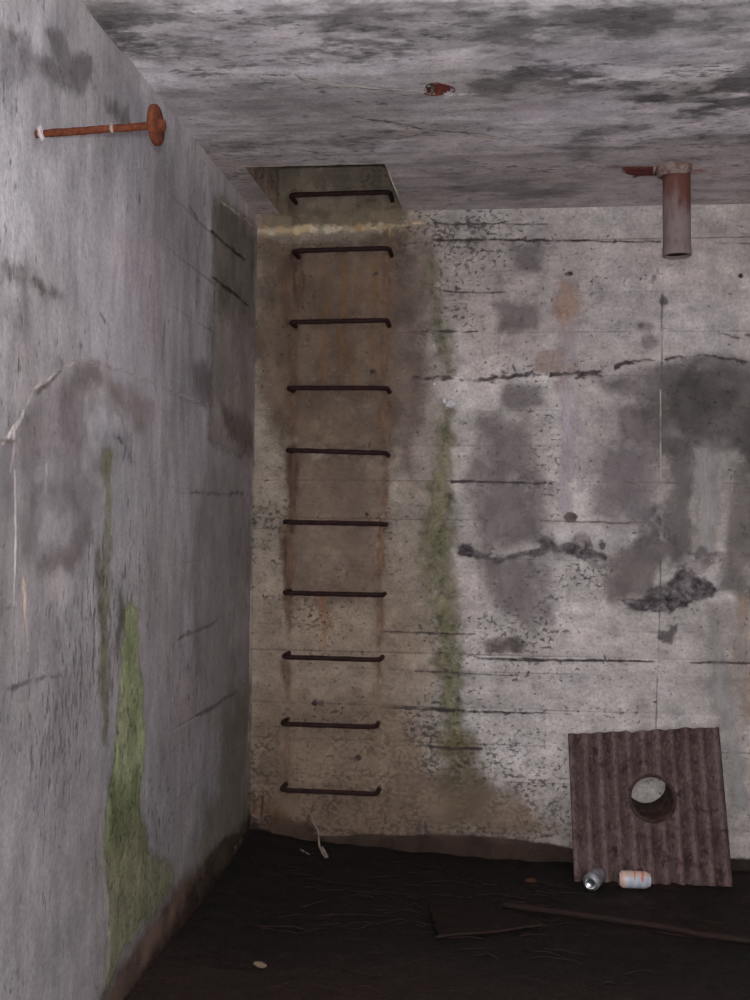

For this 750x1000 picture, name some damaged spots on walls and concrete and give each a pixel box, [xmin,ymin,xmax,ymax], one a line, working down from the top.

leakage [444,64,750,119]
rust [623,166,655,178]
crack [433,222,661,243]
crack [660,294,668,327]
crack [414,333,750,382]
crack [1,343,107,474]
leakage [603,357,750,599]
rust [283,453,298,625]
spalling [623,548,717,613]
spalling [658,626,677,644]
leakage [104,590,573,1000]
leakage [731,858,750,871]